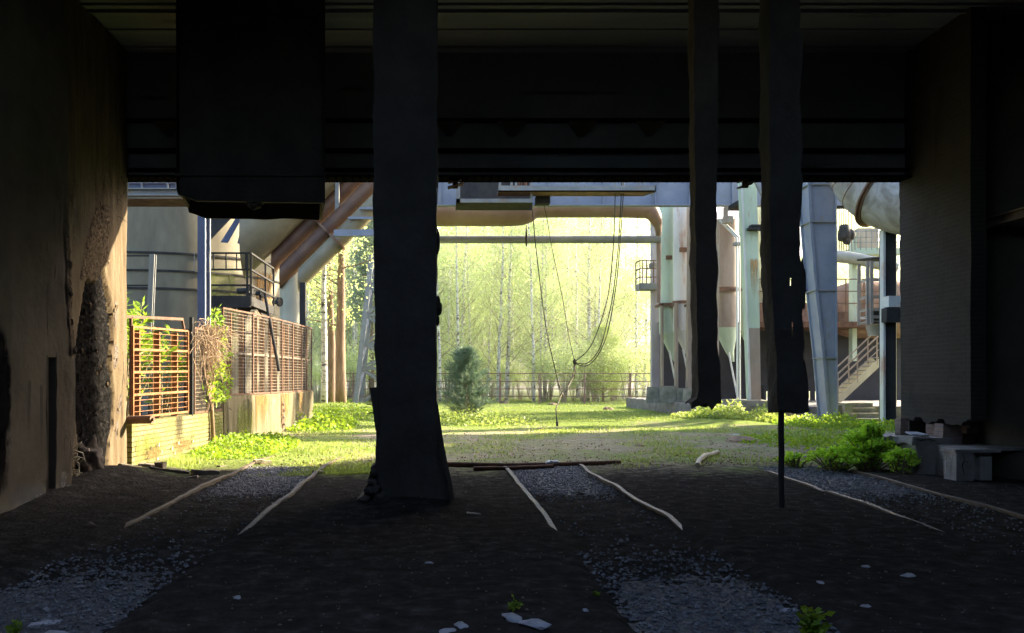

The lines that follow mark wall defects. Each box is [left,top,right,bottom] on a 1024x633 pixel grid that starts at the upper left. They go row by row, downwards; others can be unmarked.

spalling [65,202,122,466]